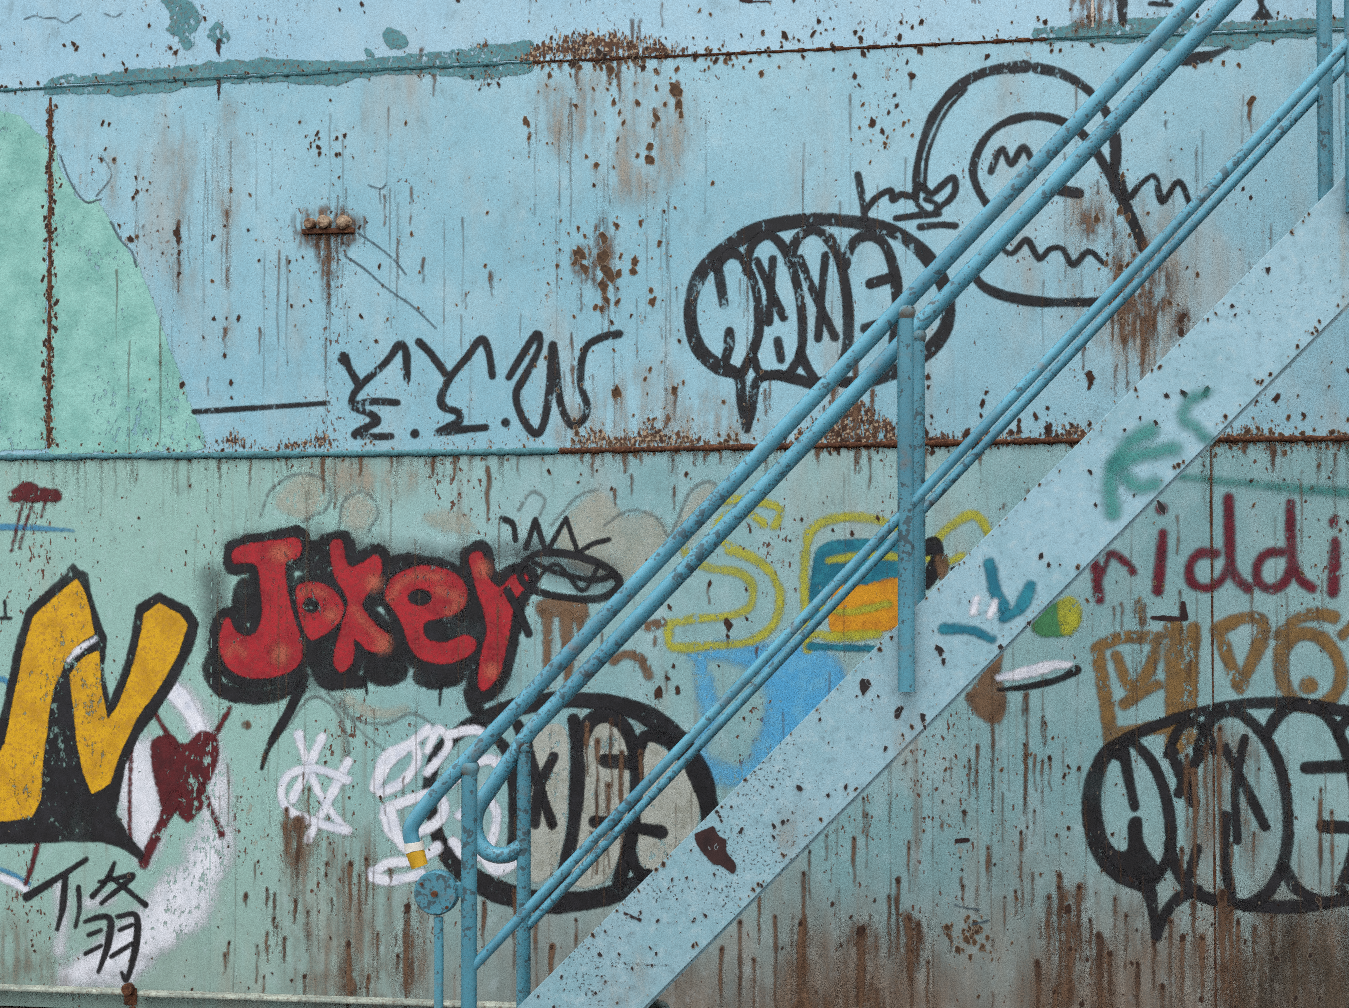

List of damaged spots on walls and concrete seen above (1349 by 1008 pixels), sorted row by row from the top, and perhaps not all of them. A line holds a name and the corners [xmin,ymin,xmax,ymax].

peeling [43,0,535,100]
rust [515,17,870,188]
rust [891,18,960,80]
rust [0,80,375,507]
rust [535,216,672,393]
rust [1070,183,1225,403]
rust [813,389,897,482]
rust [925,390,1106,468]
rust [329,856,424,1008]
rust [718,808,835,1008]
rust [840,841,1022,1008]
rust [922,691,1315,1008]